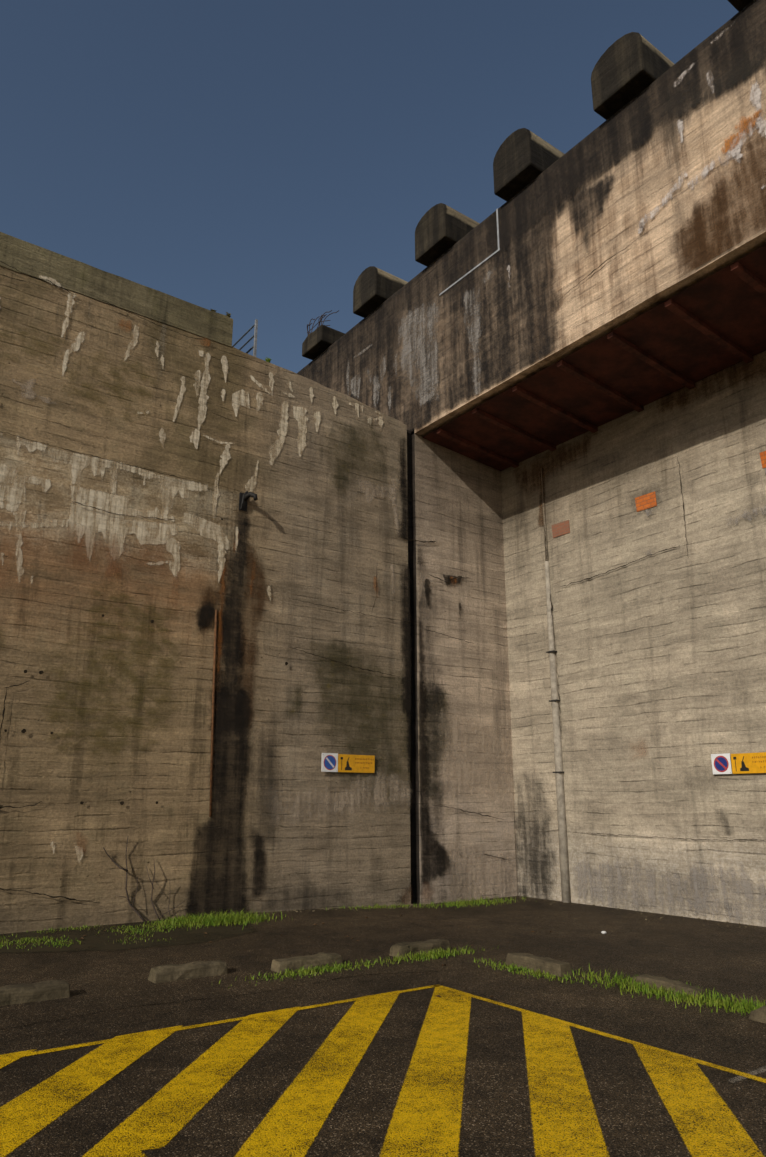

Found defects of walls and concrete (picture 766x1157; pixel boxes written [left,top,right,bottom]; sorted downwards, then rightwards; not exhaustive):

damp [0,0,766,917]
spalling [418,573,431,606]
spalling [443,574,462,585]
crack [0,680,30,740]
crack [0,888,97,903]